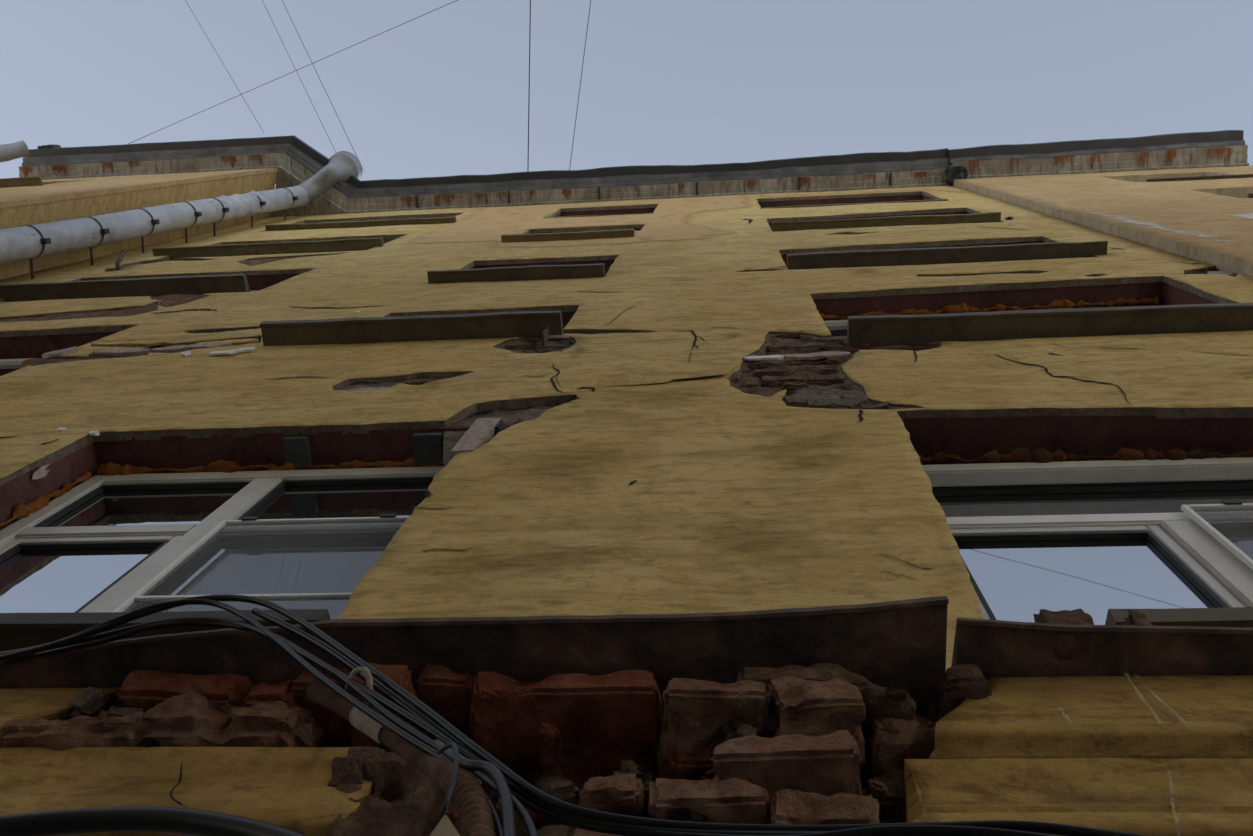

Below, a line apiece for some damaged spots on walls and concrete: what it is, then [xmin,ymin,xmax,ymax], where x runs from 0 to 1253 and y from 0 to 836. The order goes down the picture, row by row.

spalling [333,374,464,390]
crack [672,327,752,363]
spalling [729,333,876,405]
crack [996,343,1135,407]
flaking render [2,663,992,825]
flaking render [444,805,461,836]
flaking render [474,777,623,836]